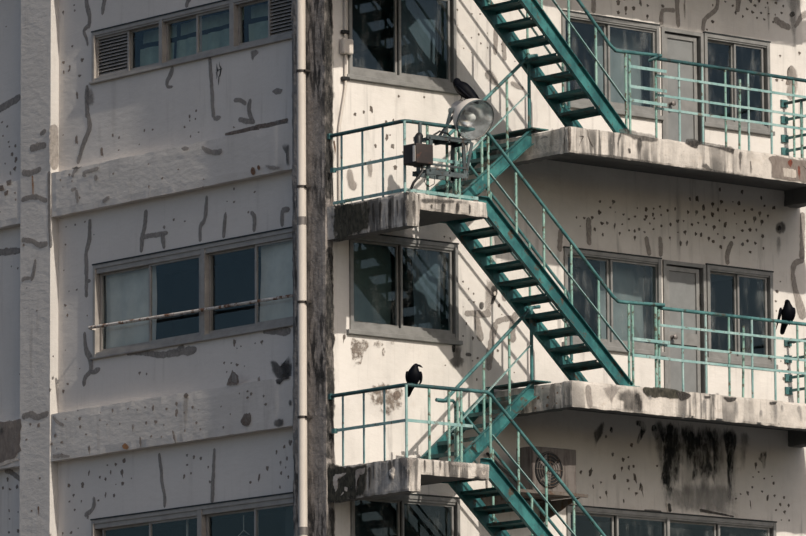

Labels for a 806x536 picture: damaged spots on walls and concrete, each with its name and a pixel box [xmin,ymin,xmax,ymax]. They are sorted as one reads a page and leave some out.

leakage [324,0,471,241]
leakage [618,129,657,153]
leakage [686,139,752,176]
leakage [451,345,471,367]
leakage [326,247,374,536]
peeling [372,384,403,415]
peeling [0,419,40,466]
leakage [388,457,426,479]
leakage [636,421,736,511]